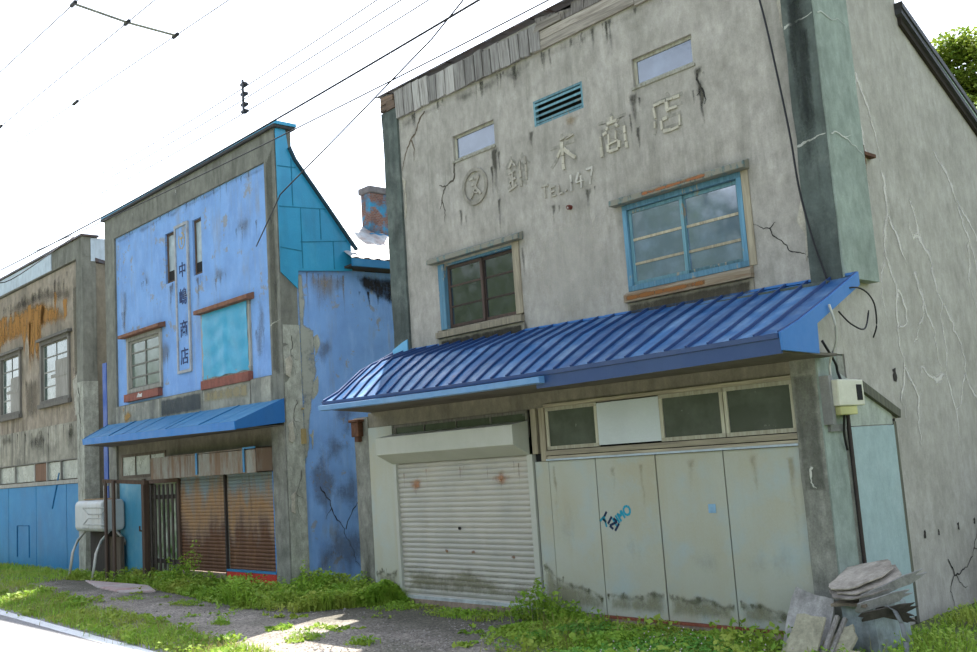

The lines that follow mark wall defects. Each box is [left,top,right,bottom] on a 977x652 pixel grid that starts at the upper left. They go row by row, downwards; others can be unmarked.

crack [784,10,846,30]
crack [402,111,425,170]
crack [439,164,455,219]
crack [753,222,808,257]
corrosion [0,292,67,359]
peeling [285,275,320,461]
crack [297,470,359,564]